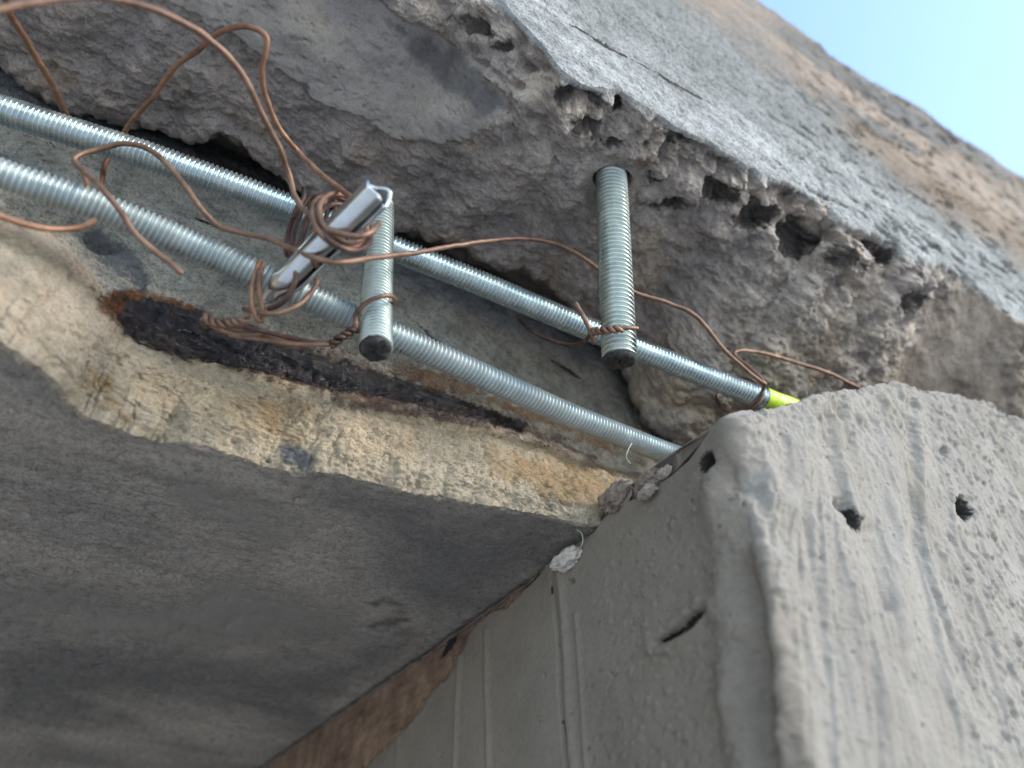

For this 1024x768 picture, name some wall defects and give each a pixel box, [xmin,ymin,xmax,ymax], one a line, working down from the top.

spalling [0,189,659,525]
corrosion [88,288,612,507]
spalling [0,0,1024,446]
crack [569,24,710,103]